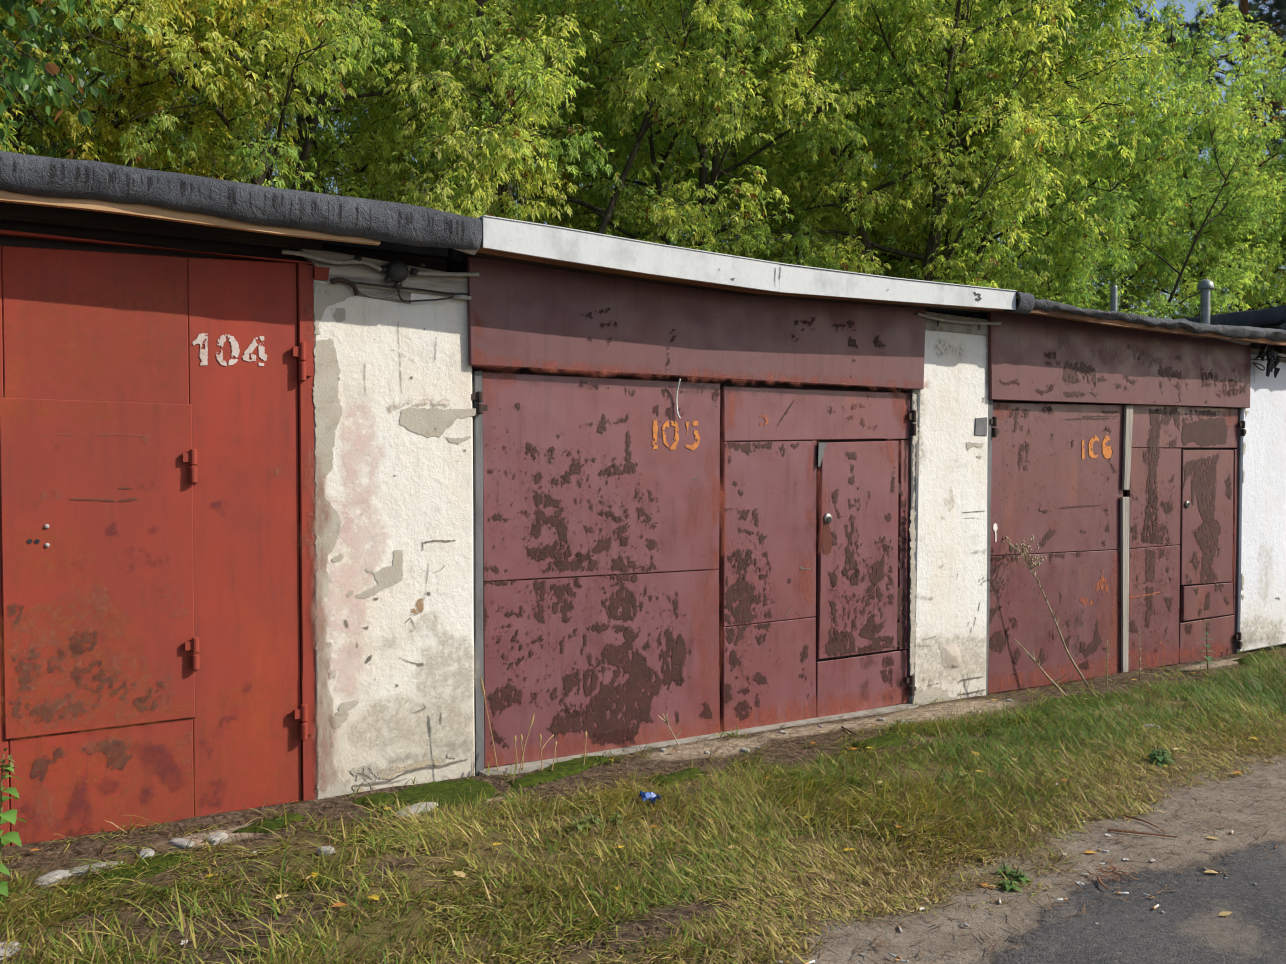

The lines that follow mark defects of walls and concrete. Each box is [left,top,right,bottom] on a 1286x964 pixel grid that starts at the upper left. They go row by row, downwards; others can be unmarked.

peeling [399,407,476,462]
rust [653,389,720,434]
rust [725,441,799,464]
peeling [313,282,359,799]
peeling [347,550,403,600]
rust [483,414,692,748]
rust [698,481,775,721]
rust [800,451,906,701]
rust [989,351,1246,676]
rust [6,630,170,727]
rust [31,747,65,782]
rust [83,738,133,771]